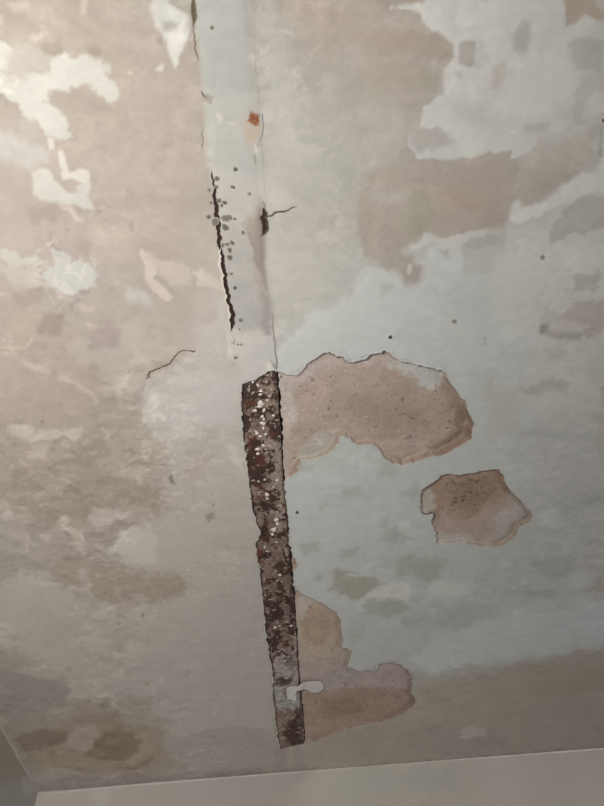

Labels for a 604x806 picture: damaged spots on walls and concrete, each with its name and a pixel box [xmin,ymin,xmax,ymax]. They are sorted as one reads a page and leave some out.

crack [260,200,297,236]
crack [211,171,235,343]
crack [145,350,196,380]
peeling [0,228,604,751]
damp [0,710,168,786]